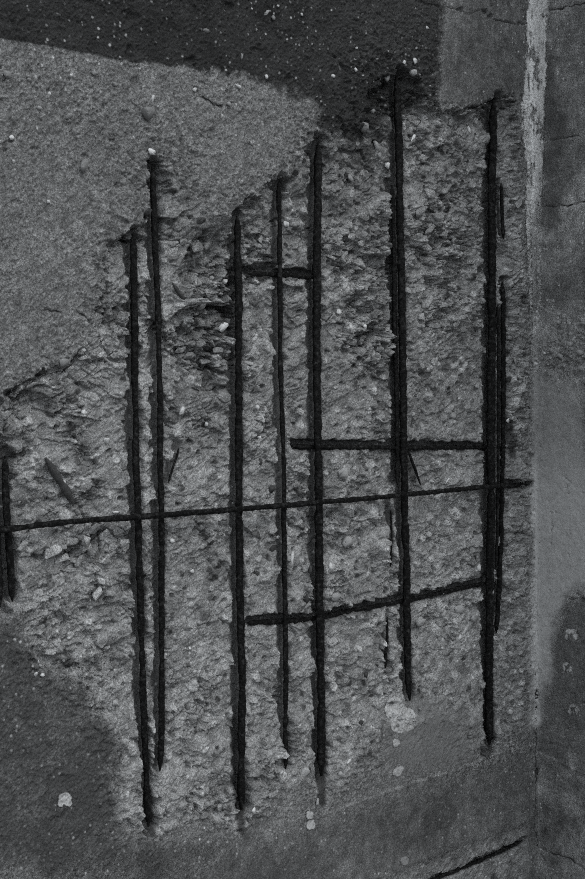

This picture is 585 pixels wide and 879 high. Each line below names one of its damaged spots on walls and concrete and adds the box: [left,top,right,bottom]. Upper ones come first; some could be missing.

spalling [0,71,533,841]